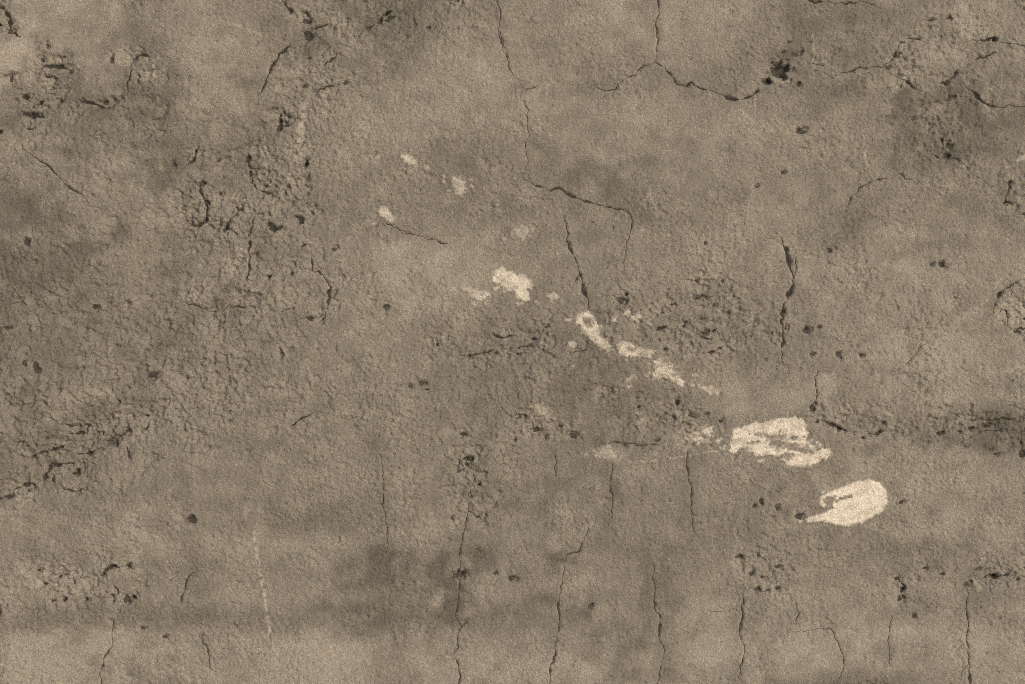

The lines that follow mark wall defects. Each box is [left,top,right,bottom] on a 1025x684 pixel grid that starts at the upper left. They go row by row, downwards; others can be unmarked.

crack [594,0,768,101]
crack [496,0,633,307]
leakage [800,181,902,277]
crack [780,237,797,363]
leakage [591,455,626,546]
leakage [737,455,772,549]
crack [454,460,478,684]
crack [549,468,613,680]
crack [652,564,665,684]
leakage [720,588,757,684]